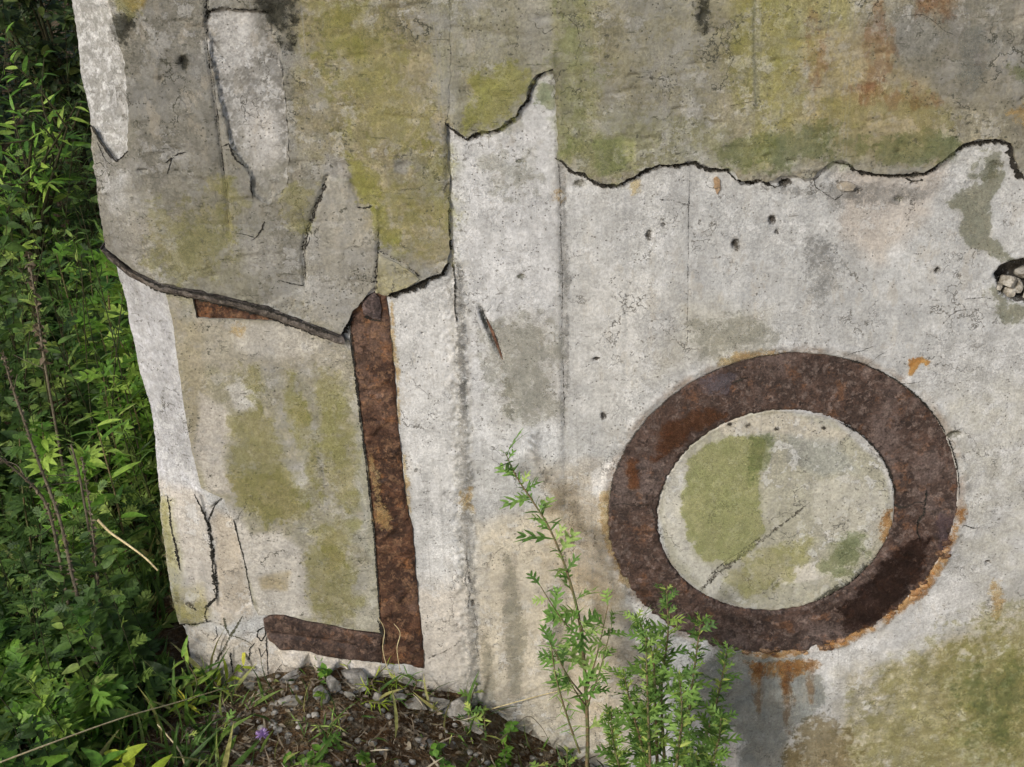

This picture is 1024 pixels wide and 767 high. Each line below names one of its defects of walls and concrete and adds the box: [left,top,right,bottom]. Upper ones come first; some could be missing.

crack [204,0,268,240]
peeling [90,0,1024,335]
crack [106,205,457,645]
spalling [481,313,503,360]
crack [167,494,282,673]
crack [700,502,810,592]
corrosion [796,539,952,655]